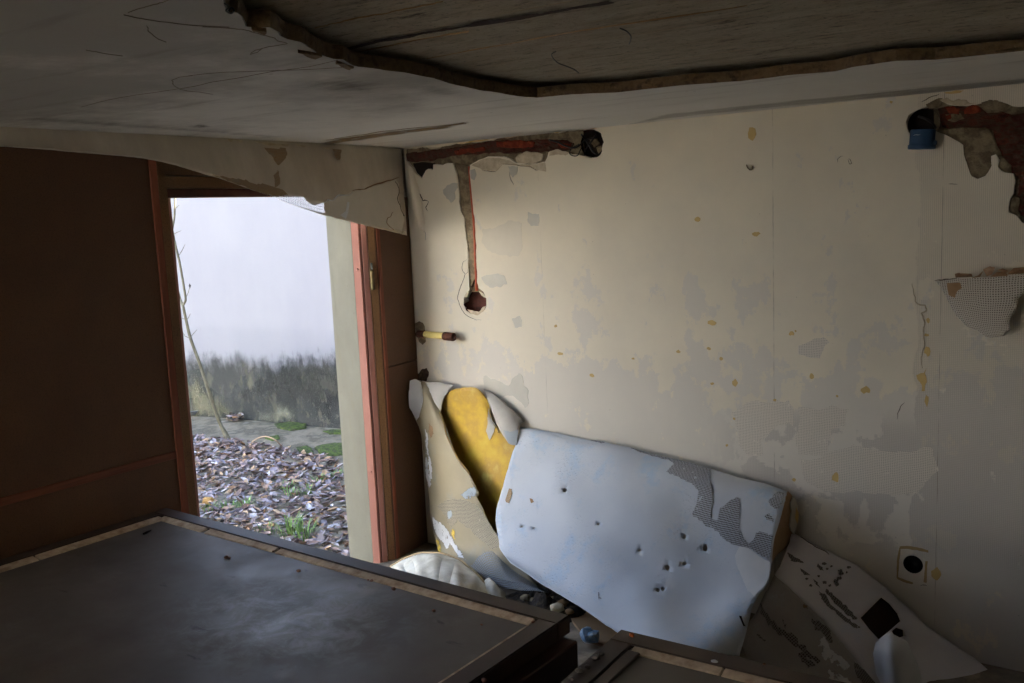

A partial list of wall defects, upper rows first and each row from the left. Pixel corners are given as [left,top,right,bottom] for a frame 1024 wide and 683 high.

flaking render [406,139,574,177]
flaking render [938,90,1024,217]
peeling [464,273,507,315]
crack [912,286,927,365]
peeling [934,266,1024,338]